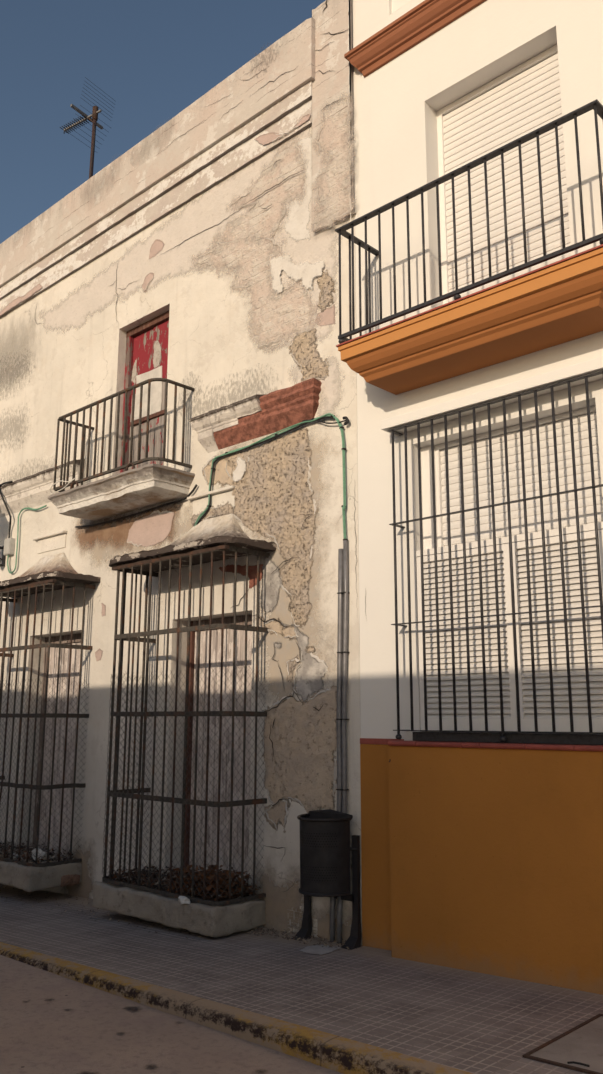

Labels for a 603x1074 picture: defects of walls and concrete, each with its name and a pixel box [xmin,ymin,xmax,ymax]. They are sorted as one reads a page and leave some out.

crack [158,0,348,154]
peeling [39,95,355,421]
spalling [191,428,337,832]